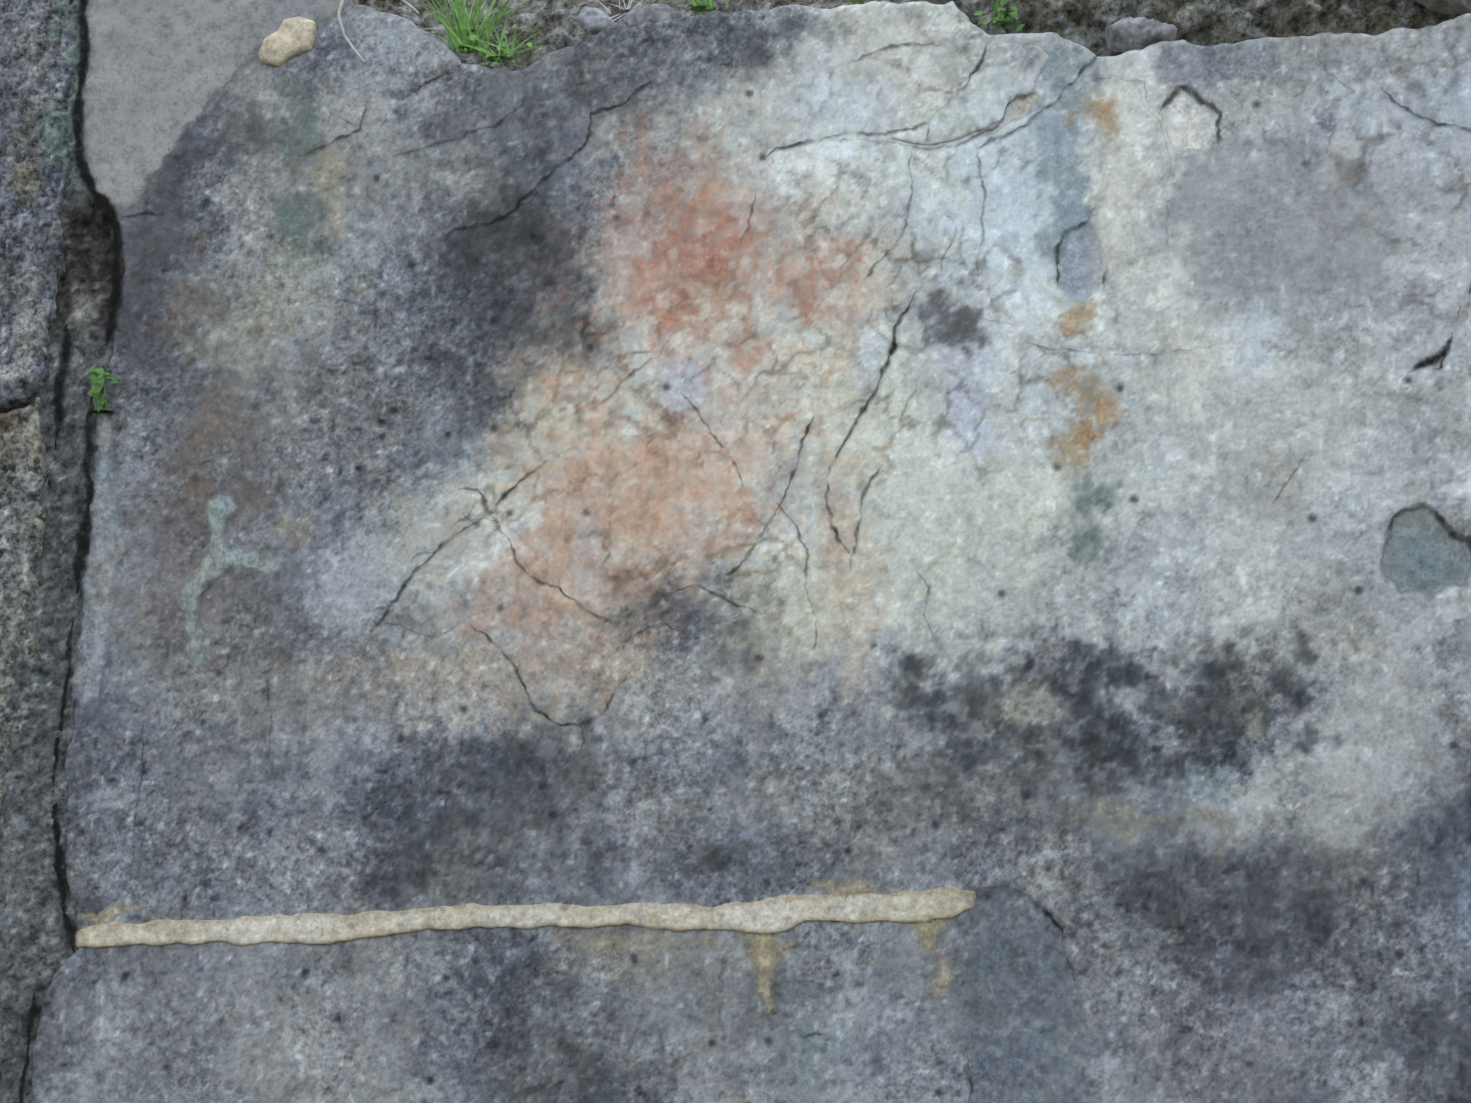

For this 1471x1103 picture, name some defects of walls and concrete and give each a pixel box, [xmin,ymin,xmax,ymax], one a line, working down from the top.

crack [454,83,648,230]
crack [770,126,929,227]
crack [969,57,1096,194]
spalling [1163,83,1222,150]
spalling [1059,227,1104,300]
crack [1413,288,1471,369]
crack [775,298,913,572]
crack [379,472,532,622]
spalling [1381,503,1471,598]
crack [475,629,585,743]
water stain [893,656,1046,763]
water stain [1055,642,1311,783]